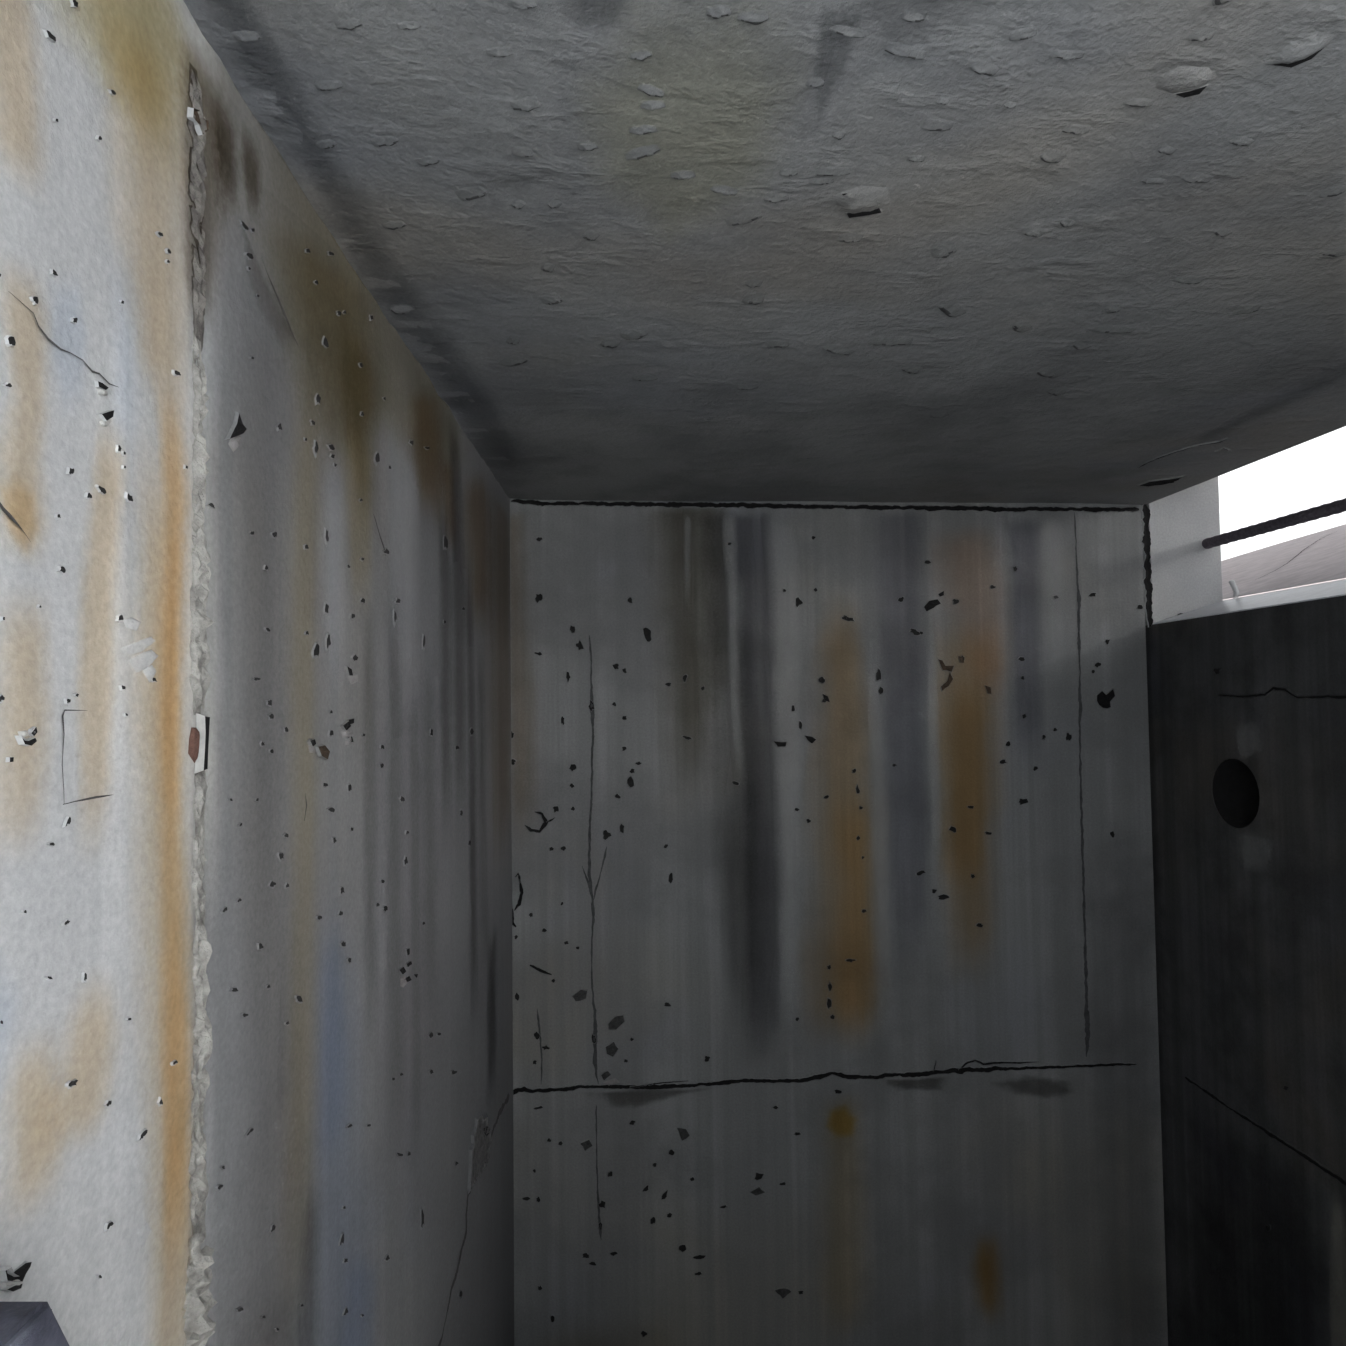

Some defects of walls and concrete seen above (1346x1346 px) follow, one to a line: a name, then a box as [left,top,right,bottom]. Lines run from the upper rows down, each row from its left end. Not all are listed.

spalling [186,107,209,136]
crack [12,294,118,387]
crack [0,502,31,542]
crack [1218,686,1346,700]
spalling [188,713,210,774]
crack [491,499,1183,1238]
crack [1185,1076,1346,1186]
crack [438,1169,484,1346]